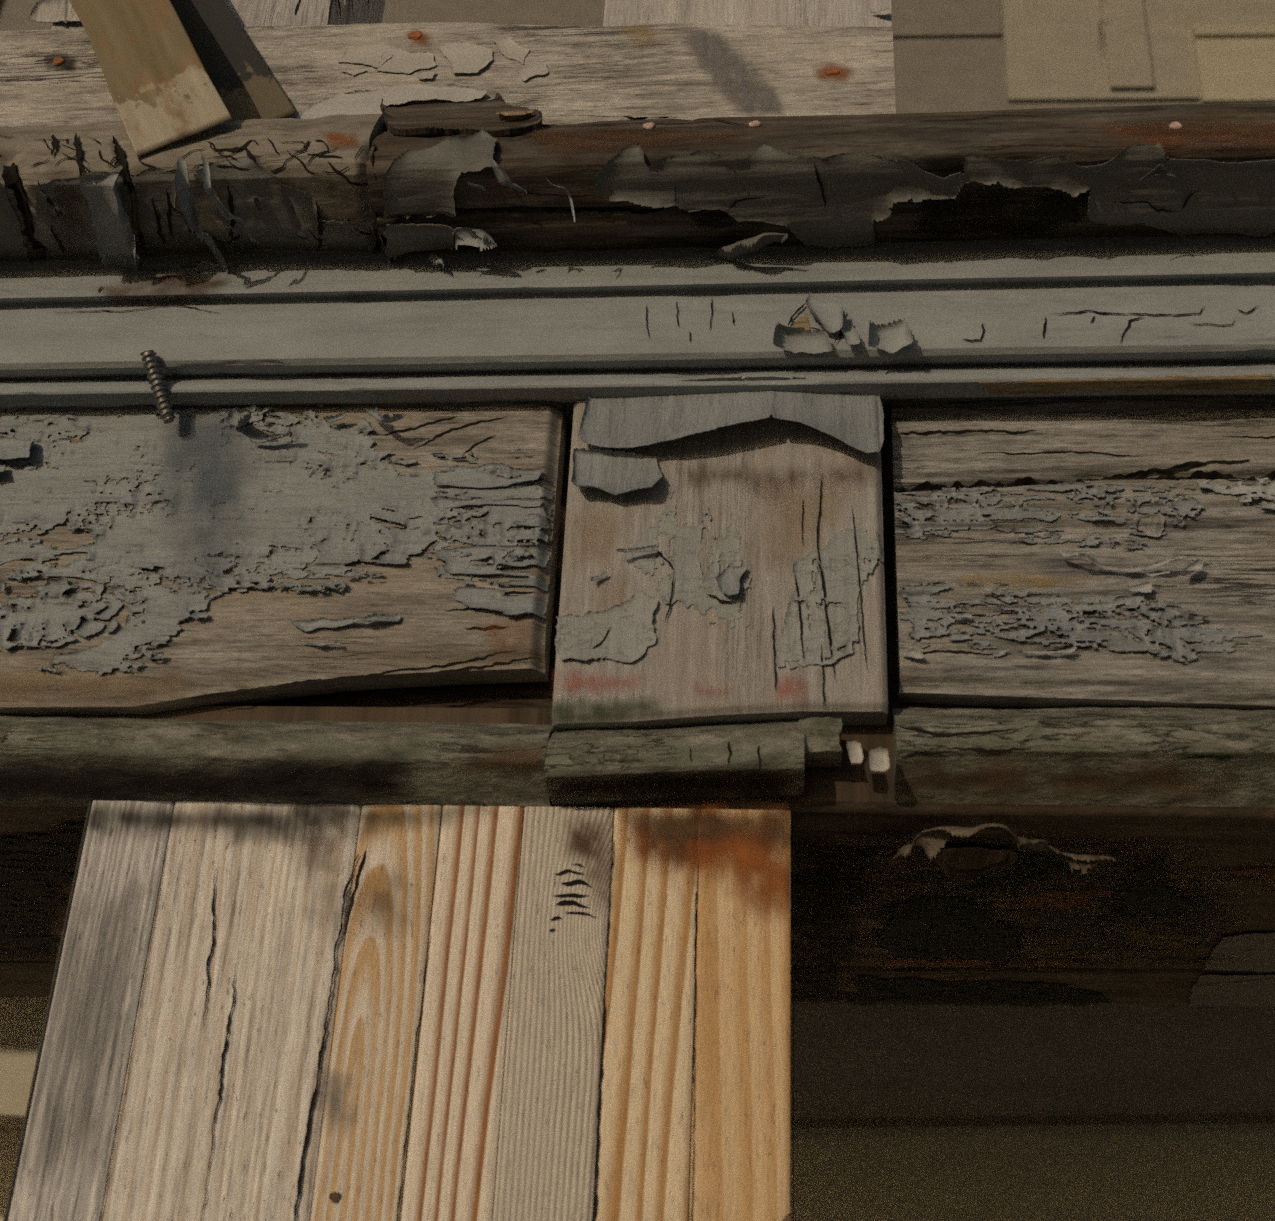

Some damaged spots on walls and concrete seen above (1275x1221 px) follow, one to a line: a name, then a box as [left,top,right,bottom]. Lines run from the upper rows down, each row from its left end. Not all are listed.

peeling [296,37,548,119]
crack [577,115,744,125]
crack [0,133,381,254]
peeling [0,129,527,275]
crack [455,185,677,214]
peeling [594,142,1275,260]
peeling [773,292,913,354]
peeling [0,376,884,676]
peeling [894,477,1275,662]
leakage [791,849,876,1003]
crack [201,869,239,1220]
crack [294,850,366,1221]